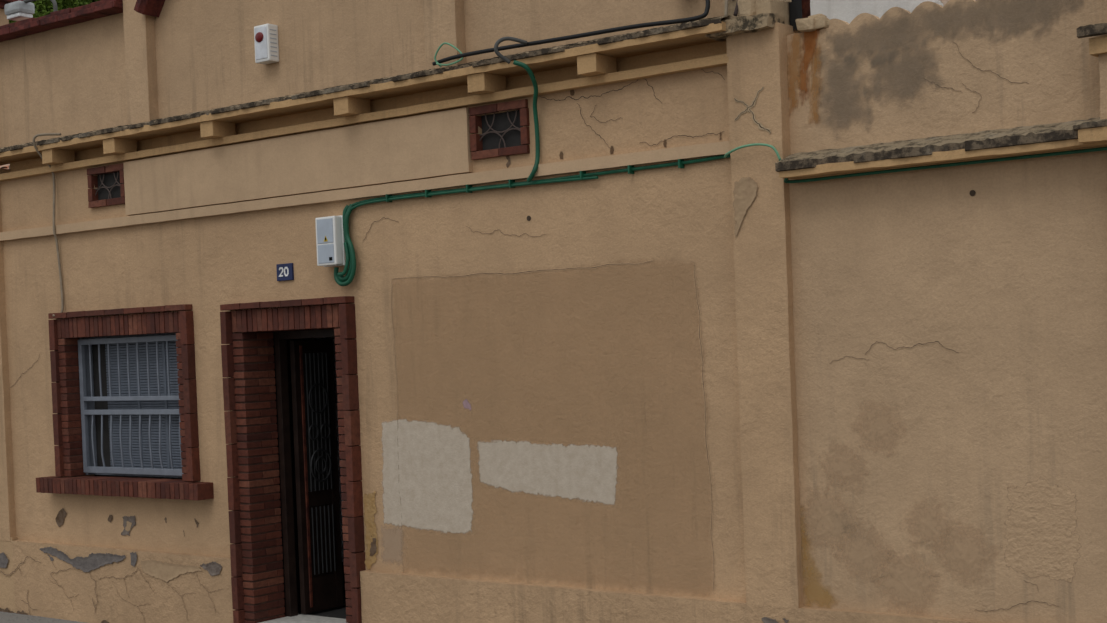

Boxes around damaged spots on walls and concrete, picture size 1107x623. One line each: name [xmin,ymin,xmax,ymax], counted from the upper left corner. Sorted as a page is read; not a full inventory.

corrosion [787,29,821,122]
crack [538,78,663,149]
crack [639,69,771,147]
crack [829,340,959,364]
spalling [55,508,67,527]
spalling [108,515,136,536]
spalling [0,552,8,568]
spalling [40,546,137,572]
spalling [200,562,222,576]